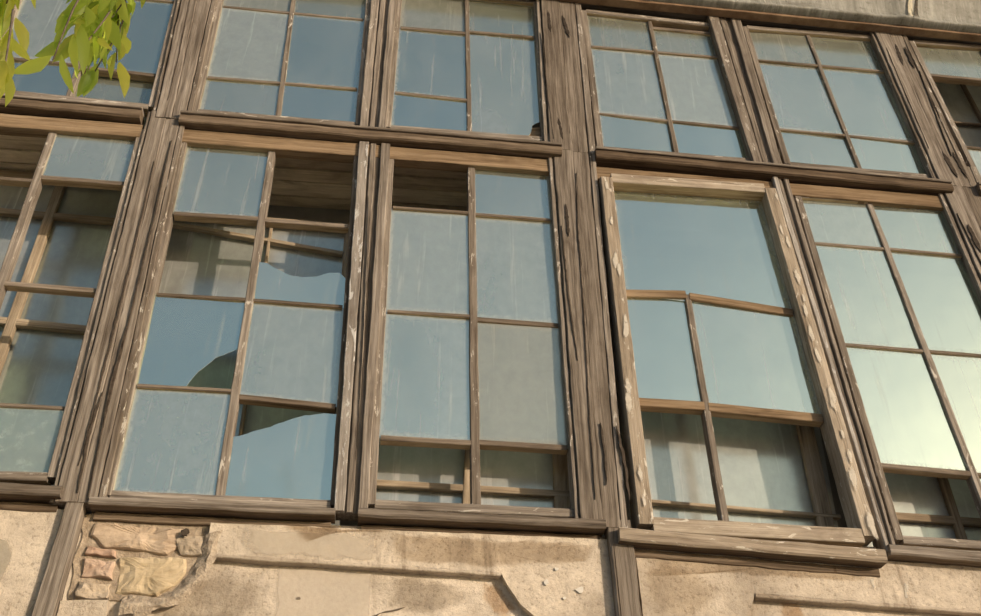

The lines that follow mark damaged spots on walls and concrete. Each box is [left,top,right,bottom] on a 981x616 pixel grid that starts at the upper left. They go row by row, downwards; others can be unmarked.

flaking render [68,514,223,616]